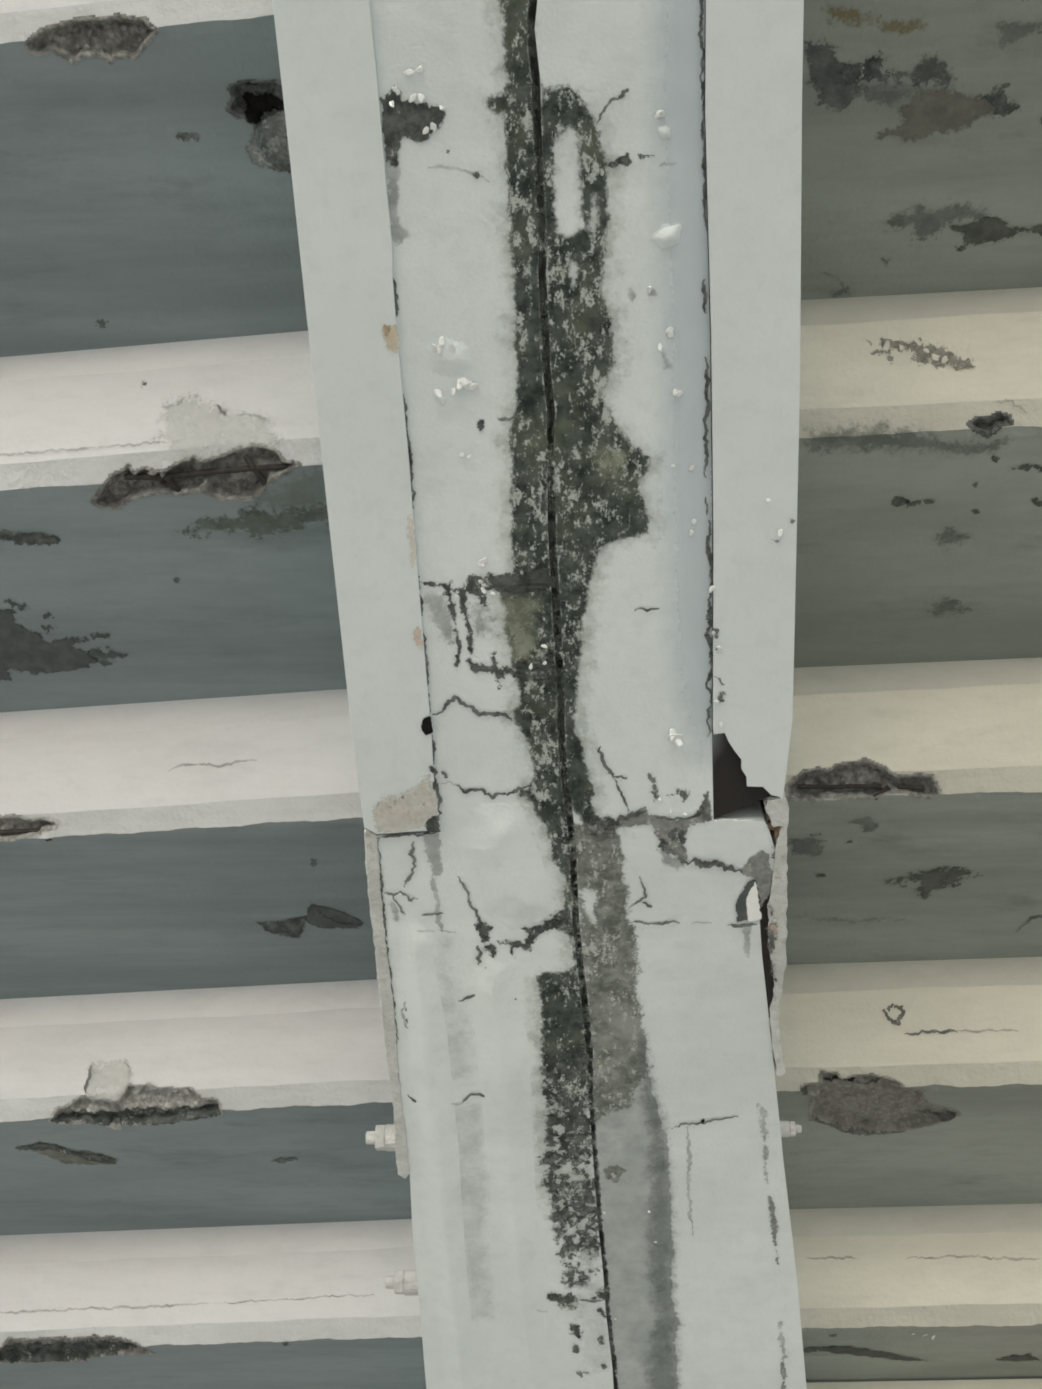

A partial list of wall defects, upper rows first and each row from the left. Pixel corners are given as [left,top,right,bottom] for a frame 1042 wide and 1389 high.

spalling [24,12,159,65]
spalling [225,79,291,173]
crack [698,0,708,231]
damp [0,530,60,546]
spalling [89,442,302,510]
damp [182,503,329,540]
crack [703,357,713,737]
damp [487,0,680,1389]
crack [377,576,532,1039]
crack [592,746,742,925]
spalling [784,757,942,802]
spalling [0,1334,155,1364]